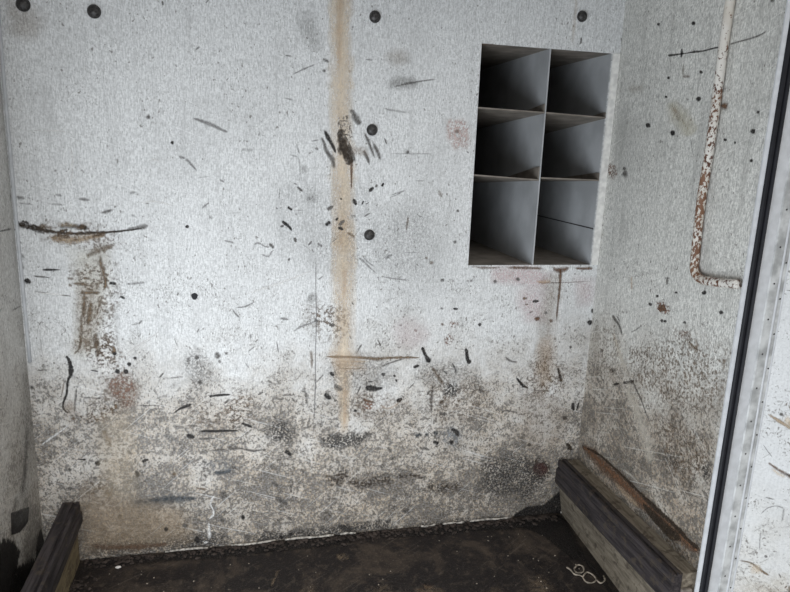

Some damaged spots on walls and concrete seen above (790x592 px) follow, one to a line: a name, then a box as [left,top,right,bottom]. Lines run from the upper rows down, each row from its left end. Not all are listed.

rust [553,267,568,318]
rust [46,224,136,422]
leakage [421,347,443,410]
leakage [187,423,251,439]
leakage [135,496,195,505]
leakage [349,474,459,492]
leakage [90,518,530,567]